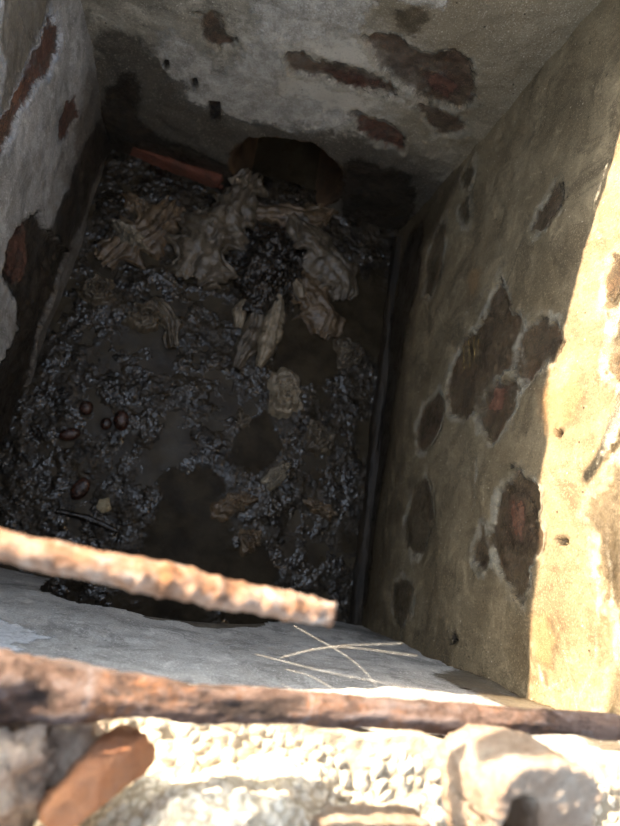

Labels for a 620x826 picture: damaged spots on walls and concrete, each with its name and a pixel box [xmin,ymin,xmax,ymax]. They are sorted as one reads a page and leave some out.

spalling [197,10,238,46]
spalling [352,110,405,150]
spalling [286,32,474,134]
spalling [531,181,565,236]
spalling [417,276,566,452]
spalling [473,468,546,606]